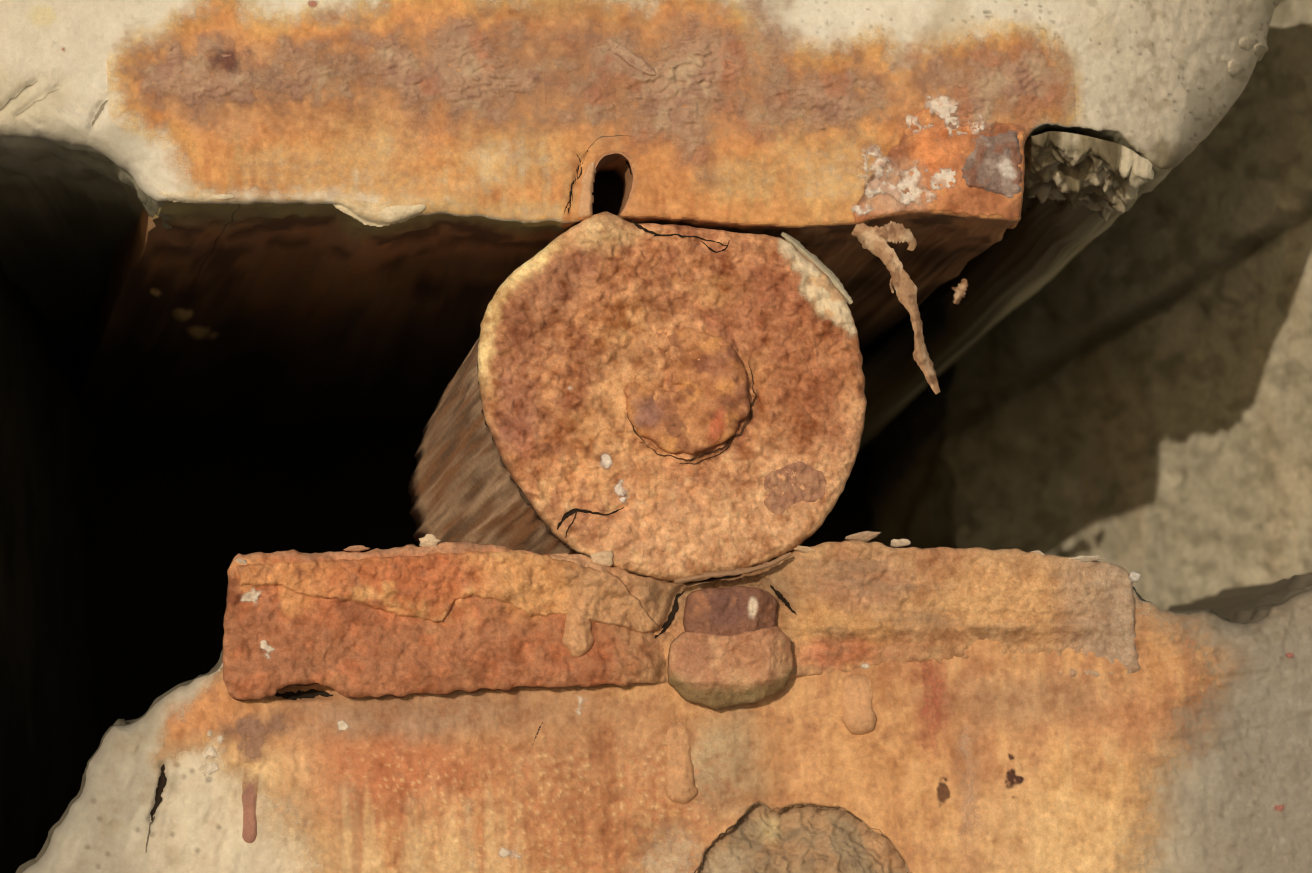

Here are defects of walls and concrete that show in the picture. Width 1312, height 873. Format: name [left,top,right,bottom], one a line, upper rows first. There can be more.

rust [112,0,1076,227]
peeling [851,96,1154,394]
rust [235,534,674,667]
rust [845,531,911,547]
rust [156,603,1219,873]
crack [145,764,167,853]
spalling [694,803,912,873]